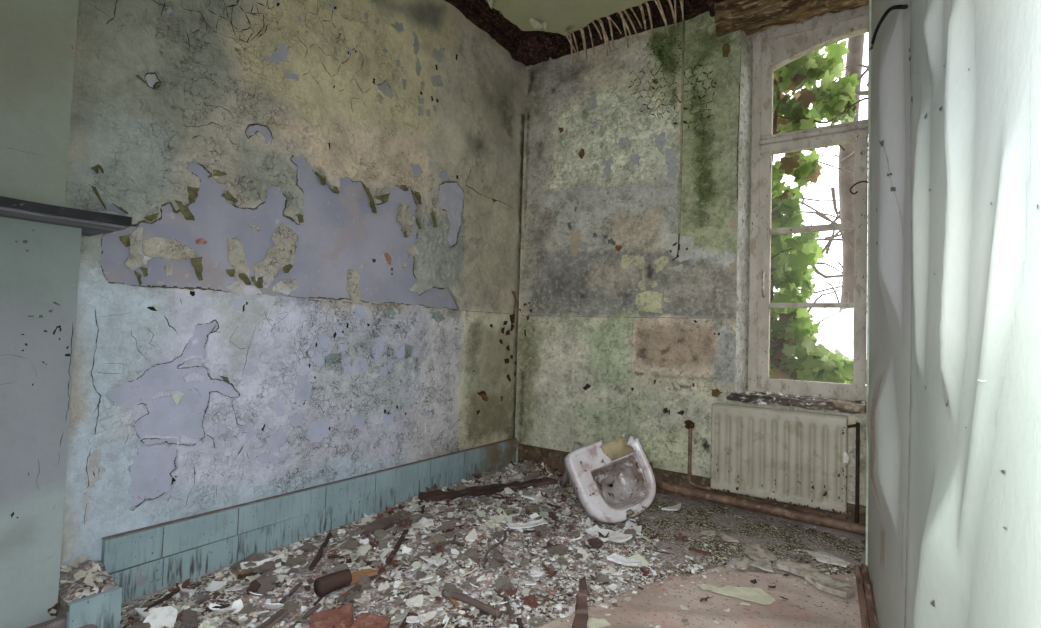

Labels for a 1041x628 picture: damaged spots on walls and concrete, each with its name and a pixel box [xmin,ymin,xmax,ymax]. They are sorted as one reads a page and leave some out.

peeling [135,69,166,93]
crack [153,0,268,65]
crack [299,0,370,112]
peeling [364,5,458,117]
peeling [529,17,547,31]
damp [650,25,676,72]
peeling [91,149,465,443]
crack [28,286,228,487]
peeling [101,316,242,511]